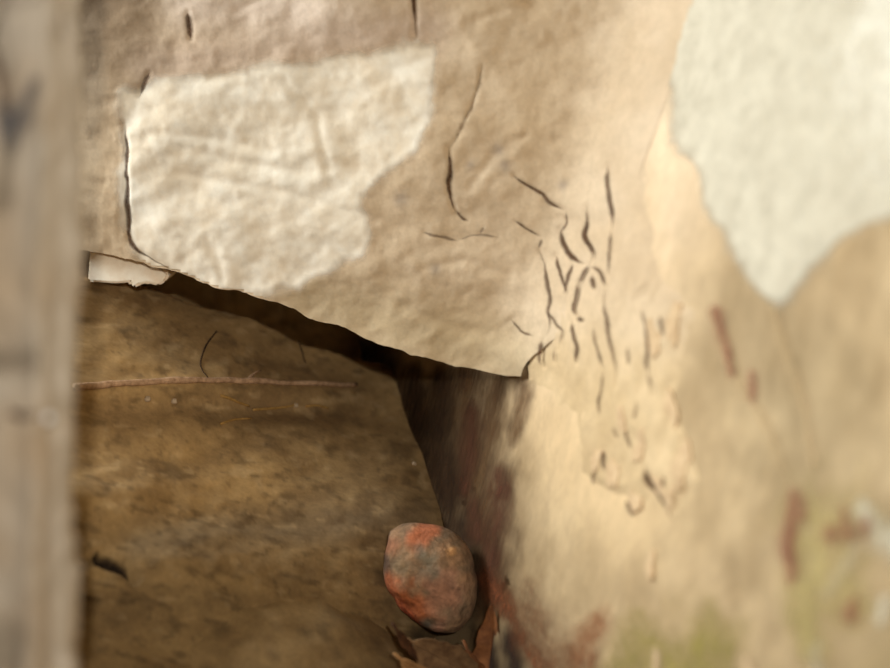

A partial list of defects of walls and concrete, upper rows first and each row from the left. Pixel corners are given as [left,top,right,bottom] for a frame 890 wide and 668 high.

crack [410,0,418,21]
spalling [118,42,436,295]
crack [446,155,465,220]
crack [514,168,664,410]
spalling [670,0,890,305]